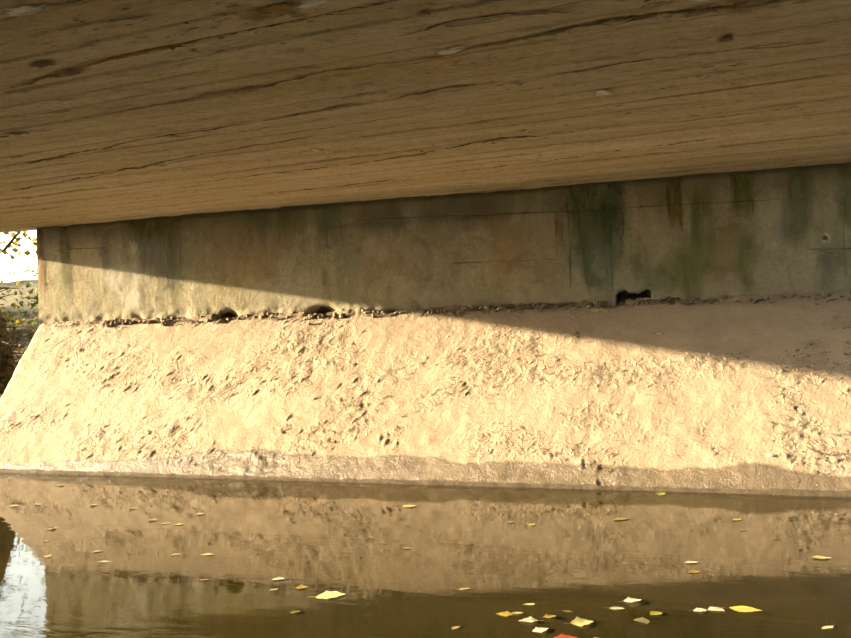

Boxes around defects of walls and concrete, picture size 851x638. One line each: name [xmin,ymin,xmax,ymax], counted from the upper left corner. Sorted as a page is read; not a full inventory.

spalling [42,290,851,345]